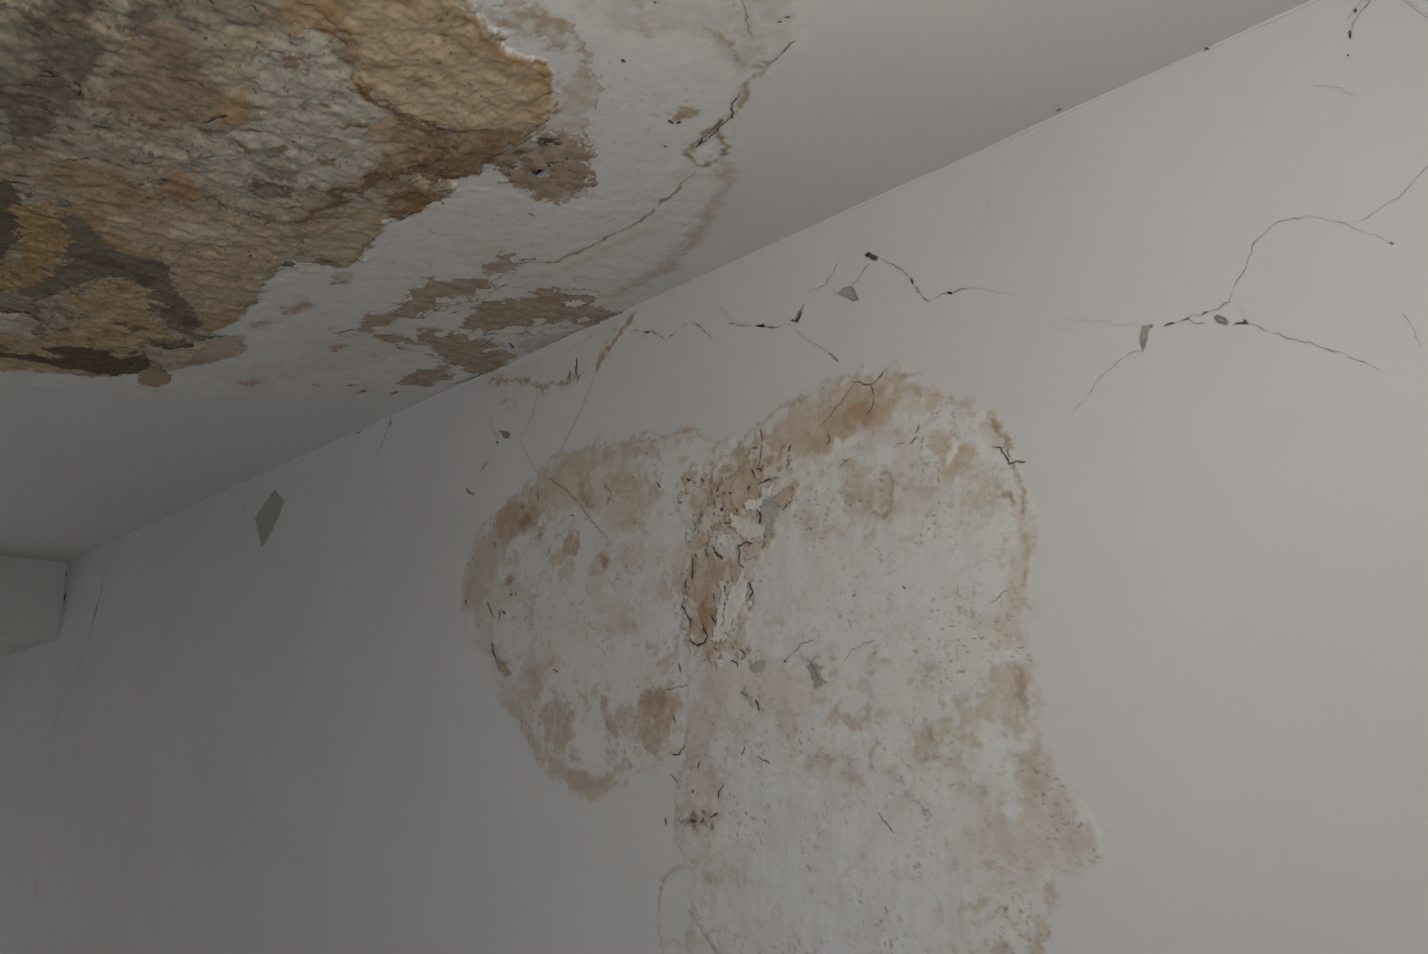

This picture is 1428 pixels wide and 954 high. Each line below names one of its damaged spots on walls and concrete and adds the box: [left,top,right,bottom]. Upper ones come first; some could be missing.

flaking render [0,0,639,401]
damp [502,0,825,301]
crack [695,92,740,149]
crack [741,0,796,65]
crack [632,178,1014,362]
crack [1049,166,1428,411]
flaking render [672,427,806,674]
damp [459,358,1112,954]